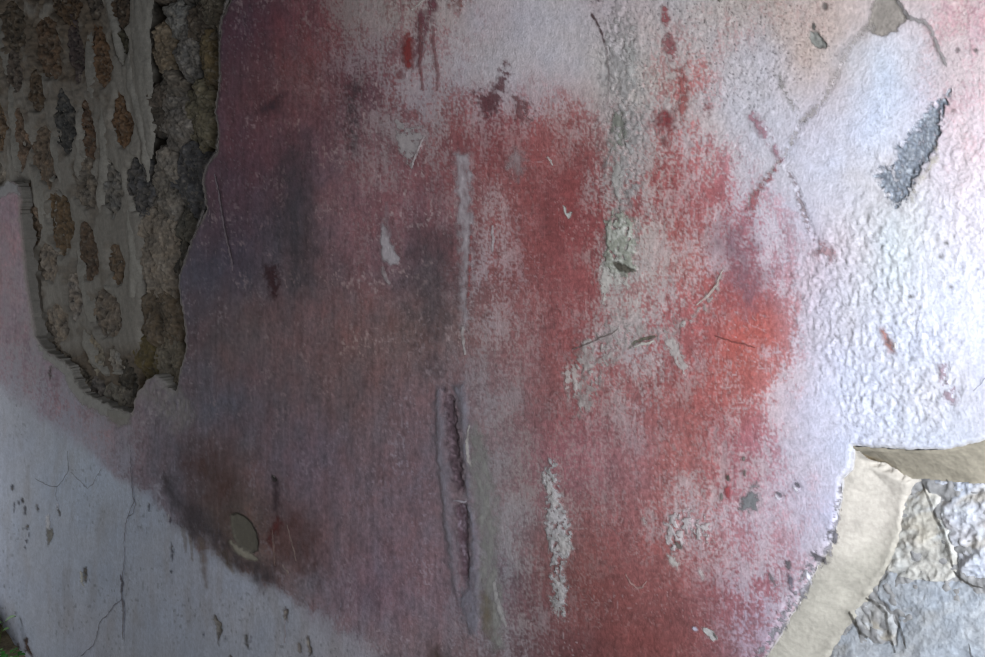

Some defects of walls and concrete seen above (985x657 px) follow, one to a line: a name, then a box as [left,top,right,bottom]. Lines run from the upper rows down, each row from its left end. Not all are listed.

spalling [0,0,231,426]
crack [747,0,947,262]
spalling [873,89,954,209]
crack [83,456,136,655]
spalling [758,440,985,657]